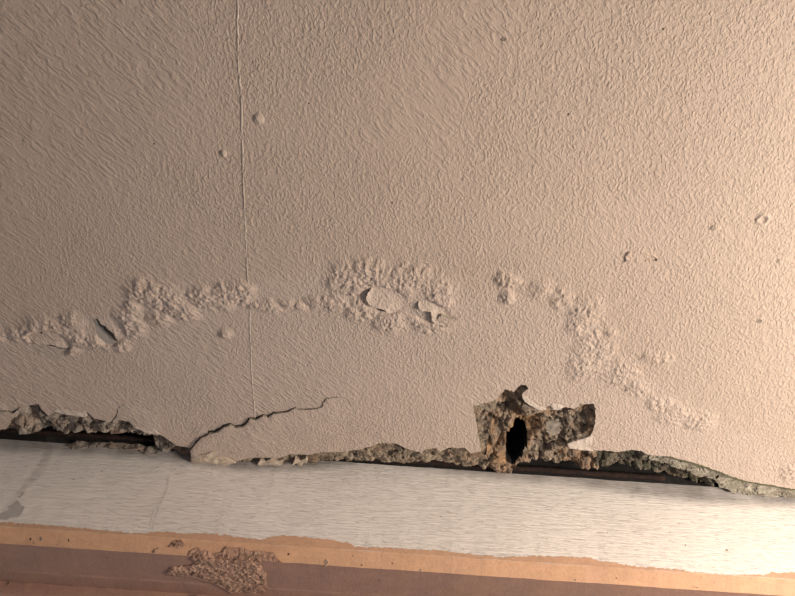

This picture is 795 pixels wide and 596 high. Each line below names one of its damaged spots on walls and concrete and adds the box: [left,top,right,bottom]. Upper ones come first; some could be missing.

peeling [95,317,123,344]
peeling [363,288,454,326]
crack [190,397,351,450]
spalling [0,385,795,498]
rust [487,420,507,464]
flaking render [168,540,281,594]